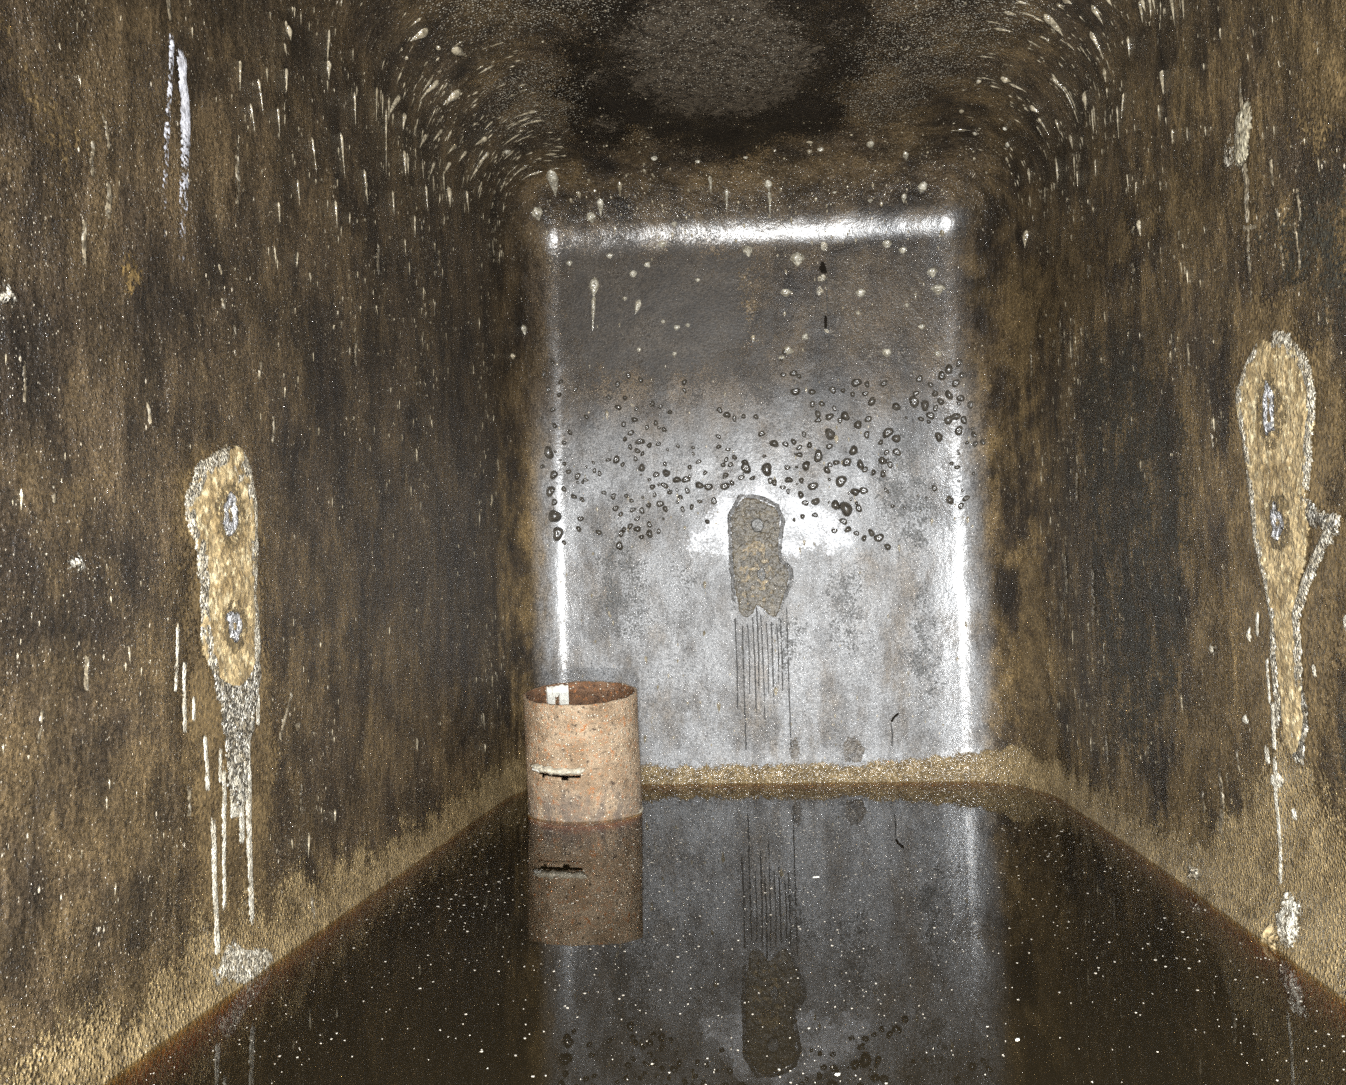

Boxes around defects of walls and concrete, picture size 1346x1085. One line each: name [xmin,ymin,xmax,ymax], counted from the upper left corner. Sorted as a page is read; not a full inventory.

leakage [163,0,191,237]
leakage [422,0,1054,169]
leakage [814,241,958,377]
leakage [1224,81,1346,337]
corrosion [727,494,794,749]
leakage [673,478,865,652]
leakage [770,616,807,674]
leakage [870,425,940,554]
leakage [899,588,944,697]
leakage [1073,311,1196,772]
leakage [0,746,527,1085]
leakage [640,706,1346,1073]